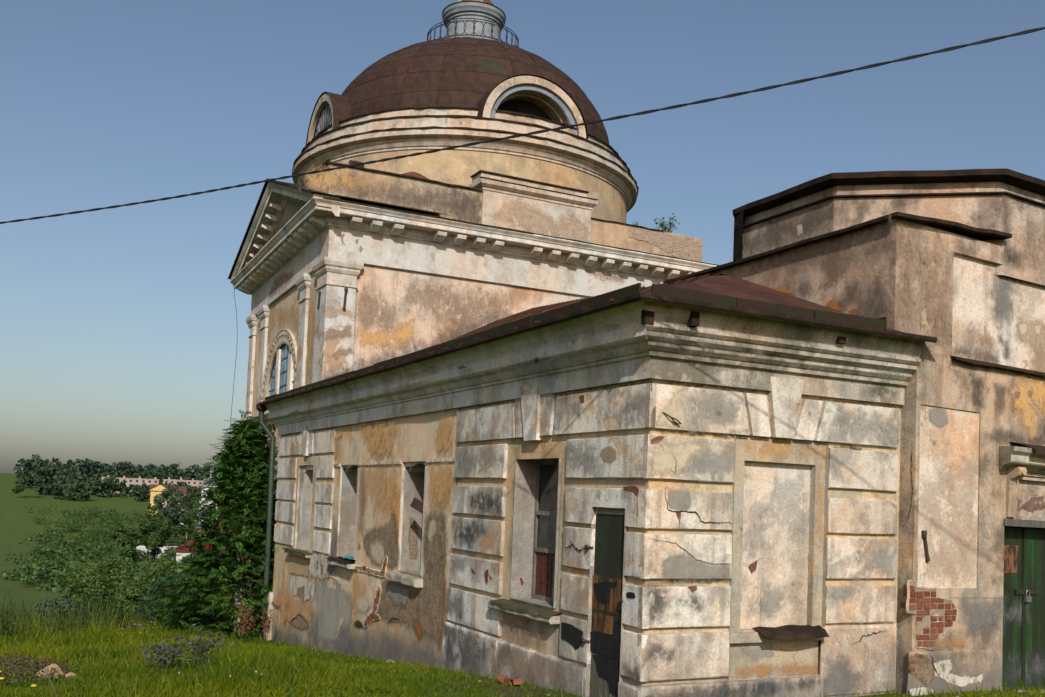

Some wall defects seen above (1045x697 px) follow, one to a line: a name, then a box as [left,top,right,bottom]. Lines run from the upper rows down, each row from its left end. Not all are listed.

spalling [352,416,452,643]
crack [636,445,759,565]
peeling [1018,496,1045,513]
flaking render [274,553,332,630]
damp [335,591,487,668]